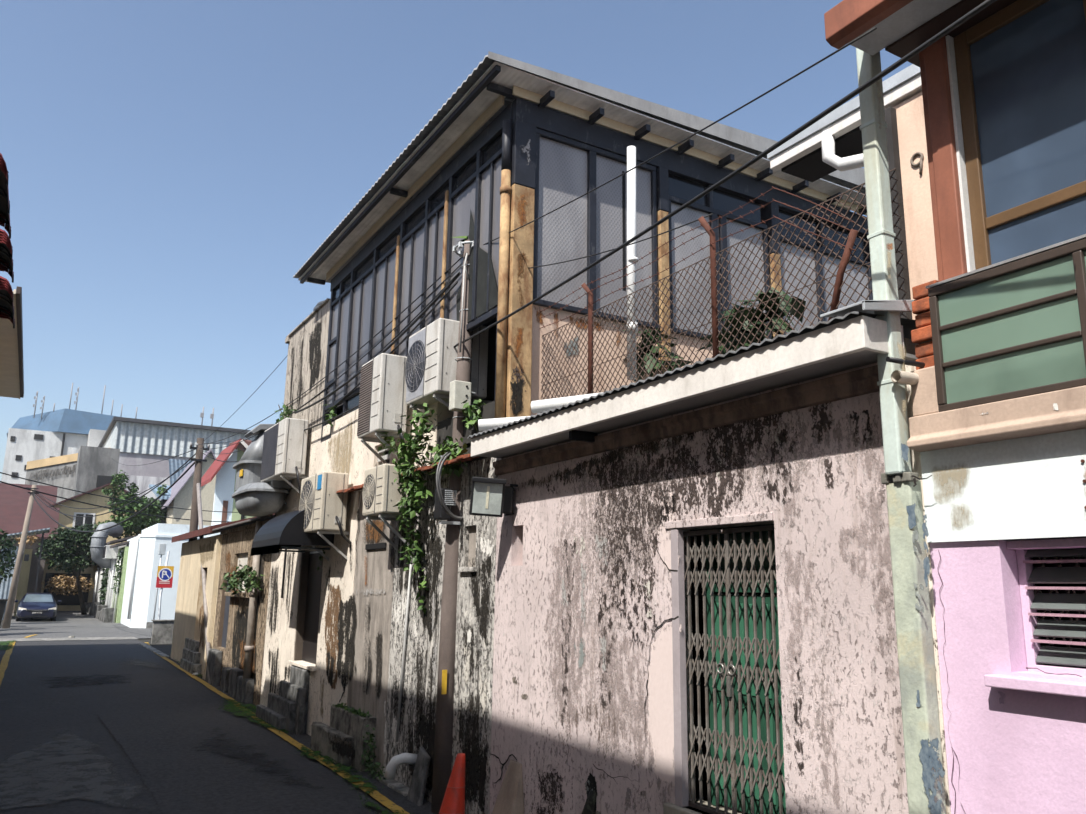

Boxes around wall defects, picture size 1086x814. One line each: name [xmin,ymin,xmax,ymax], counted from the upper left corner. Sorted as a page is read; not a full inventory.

water stain [290,320,322,418]
water stain [199,541,294,694]
water stain [350,520,442,794]
water stain [458,690,488,812]
crack [490,754,517,783]
water stain [514,402,899,814]
peeling [919,738,945,814]
crack [937,550,966,814]